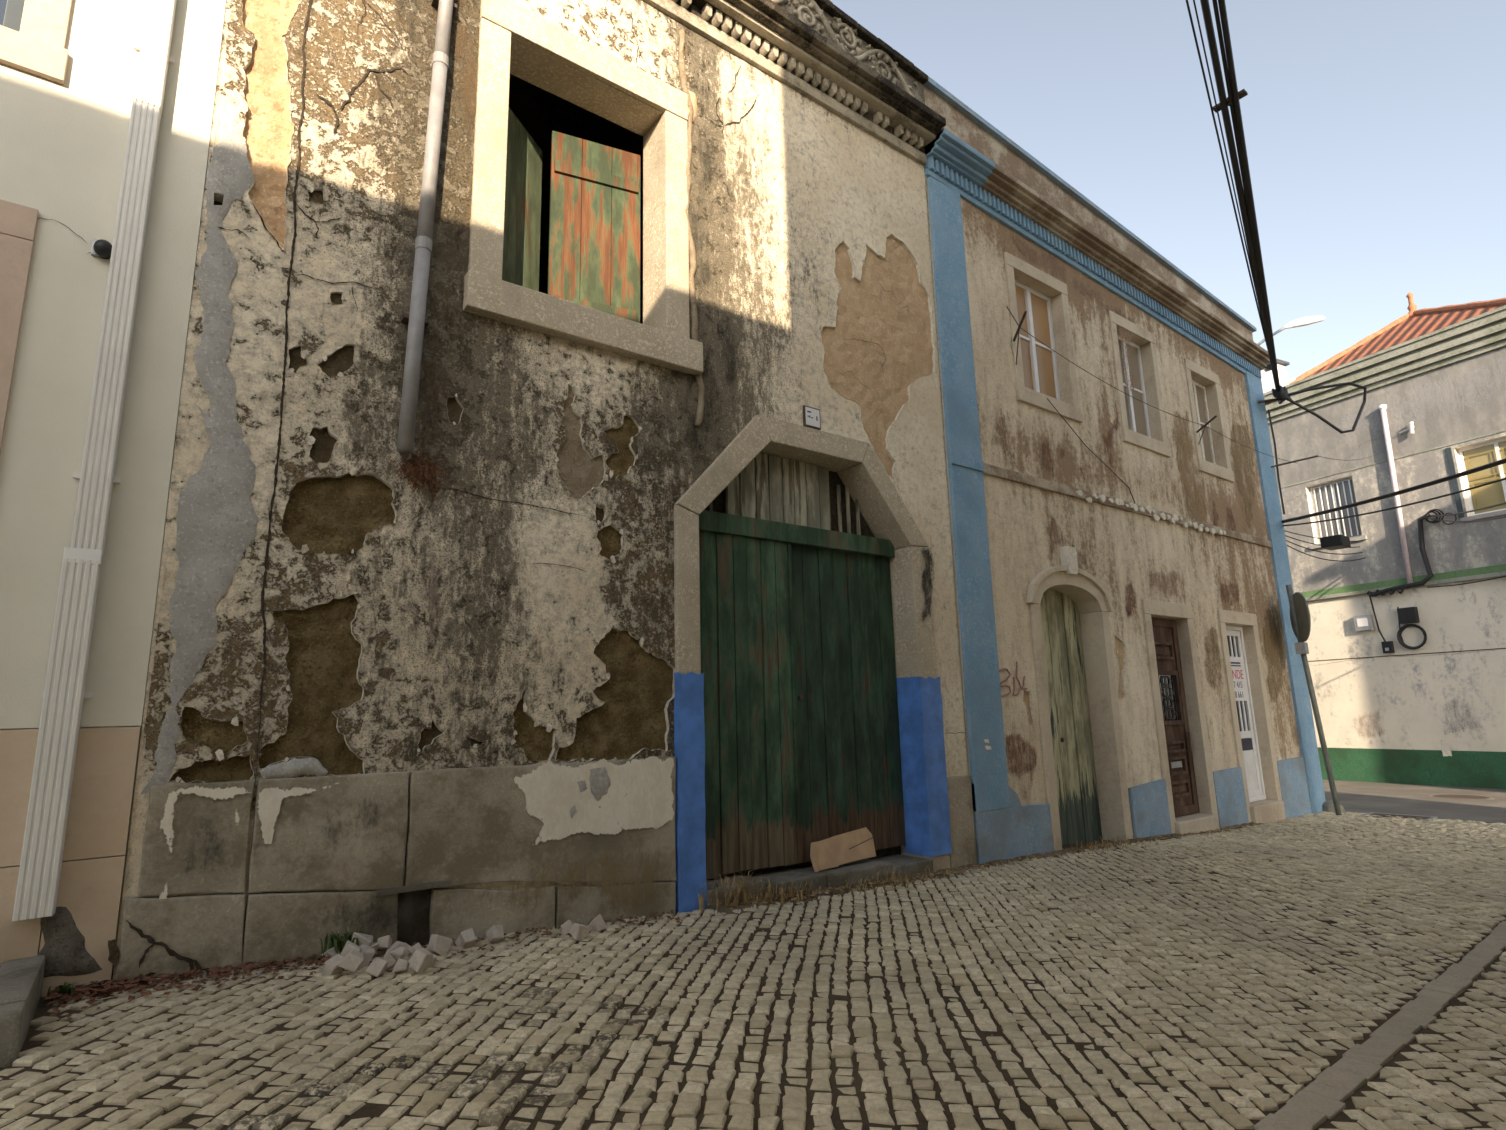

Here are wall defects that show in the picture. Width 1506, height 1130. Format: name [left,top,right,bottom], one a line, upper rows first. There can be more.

flaking render [242,0,300,251]
leakage [689,144,713,289]
crack [218,0,414,786]
flaking render [820,233,935,478]
flaking render [281,426,397,555]
leakage [1173,411,1255,529]
flaking render [160,591,365,853]
peeling [511,623,675,845]
leakage [1005,734,1036,780]
leakage [1126,585,1136,616]
leakage [1263,600,1286,701]
peeling [37,907,120,978]